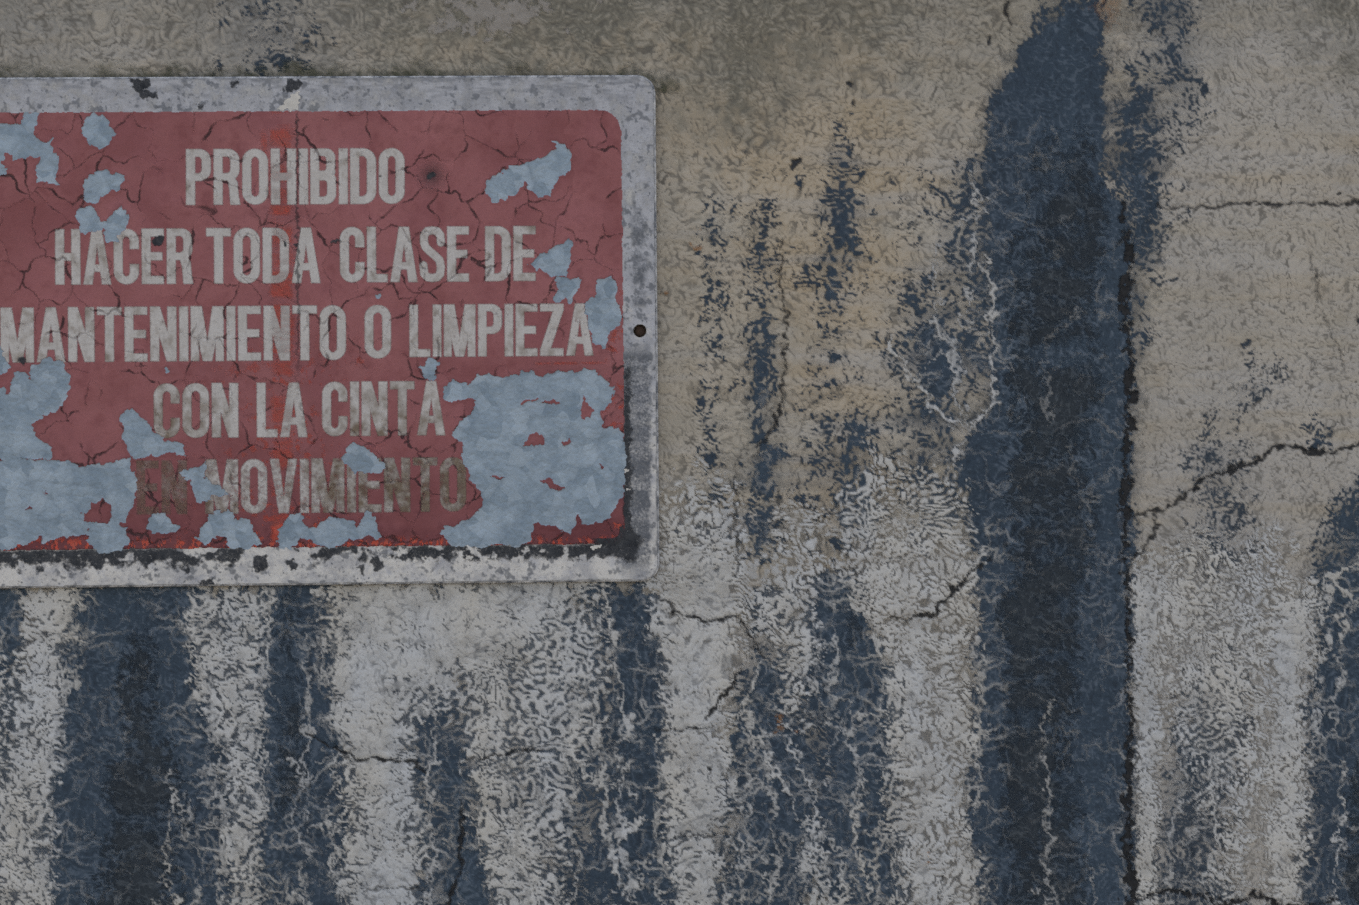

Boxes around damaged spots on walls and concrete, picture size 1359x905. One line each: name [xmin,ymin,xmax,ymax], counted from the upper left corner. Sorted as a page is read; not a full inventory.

leakage [695,195,741,362]
leakage [742,198,781,293]
leakage [793,119,878,401]
leakage [693,379,726,475]
leakage [1180,411,1222,485]
leakage [1230,339,1289,448]
leakage [1299,414,1333,450]
crack [1117,199,1359,905]